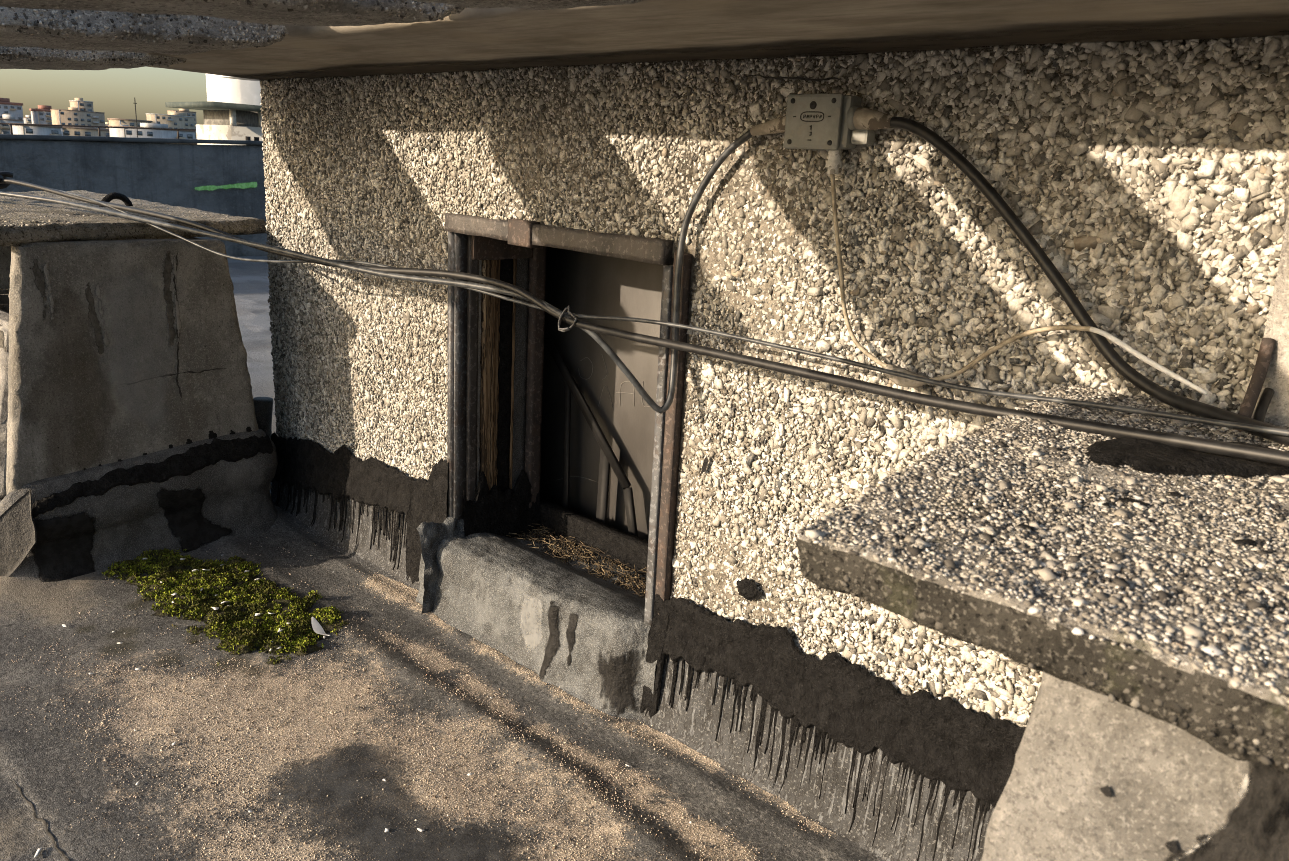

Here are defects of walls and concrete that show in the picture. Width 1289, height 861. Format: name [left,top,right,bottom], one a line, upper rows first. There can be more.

crack [121,253,226,398]
crack [13,781,69,861]